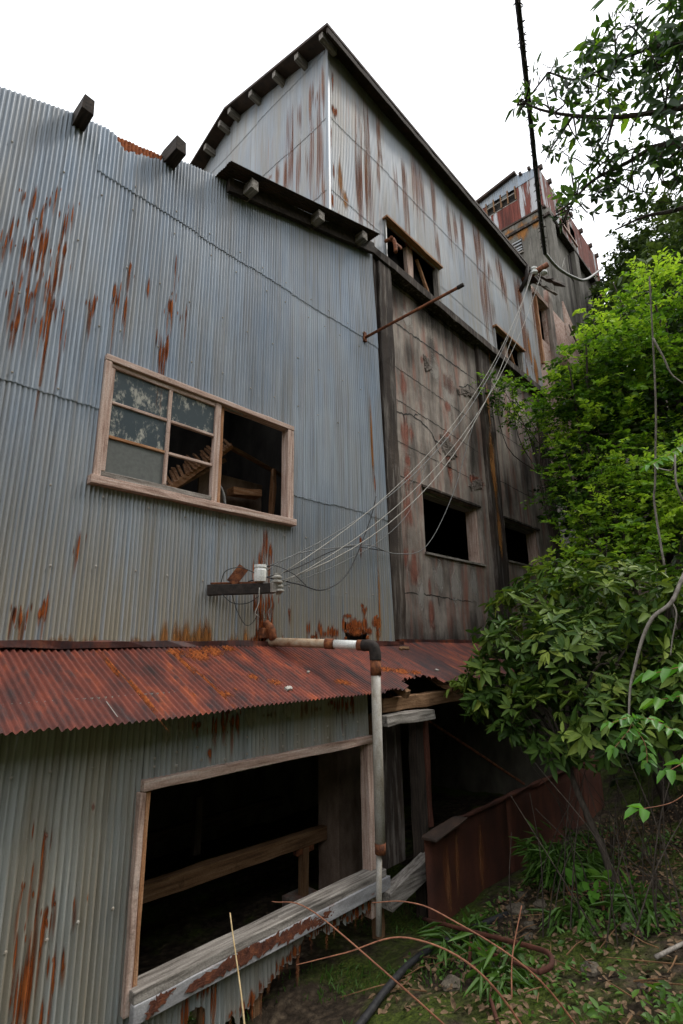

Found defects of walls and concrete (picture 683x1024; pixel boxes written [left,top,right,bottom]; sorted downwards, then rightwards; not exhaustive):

corrosion [269,74,382,226]
corrosion [0,187,80,399]
corrosion [86,296,98,332]
corrosion [110,263,135,344]
corrosion [156,256,187,375]
corrosion [8,595,49,640]
corrosion [132,594,291,761]
corrosion [252,533,272,580]
corrosion [9,824,64,1024]
corrosion [145,901,371,1024]